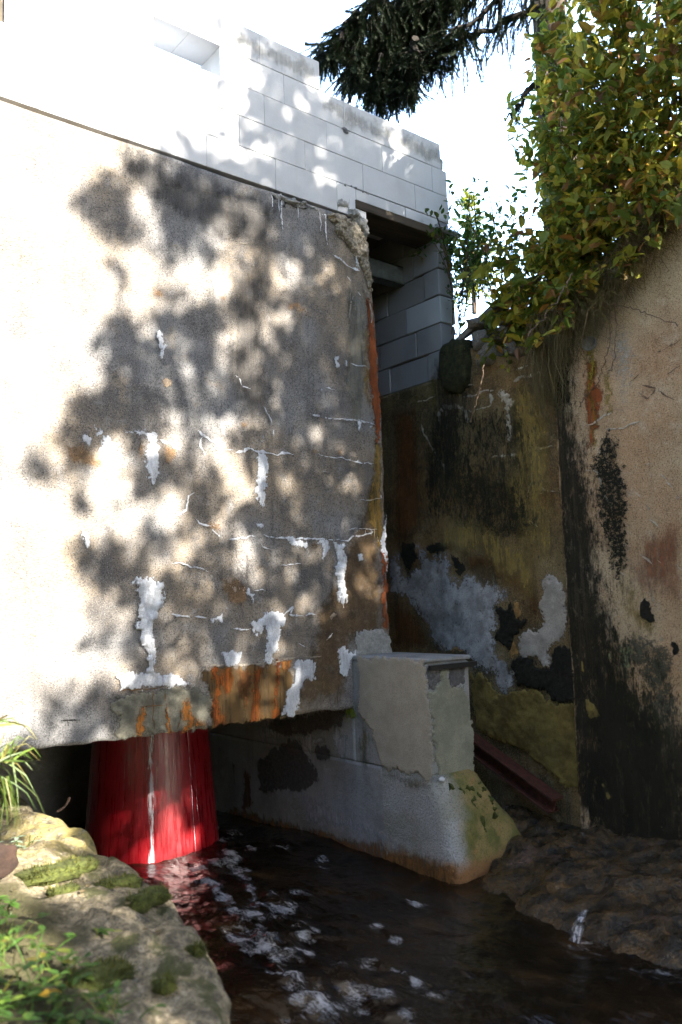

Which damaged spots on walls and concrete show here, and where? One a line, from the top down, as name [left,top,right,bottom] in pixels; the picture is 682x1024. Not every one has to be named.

spalling [327,199,373,293]
crack [313,414,375,431]
corrosion [364,297,389,630]
efflorescence [497,389,515,442]
corrosion [583,351,603,446]
corrosion [136,707,147,737]
corrosion [166,656,320,734]
water stain [229,492,465,793]
flaking render [389,545,599,791]